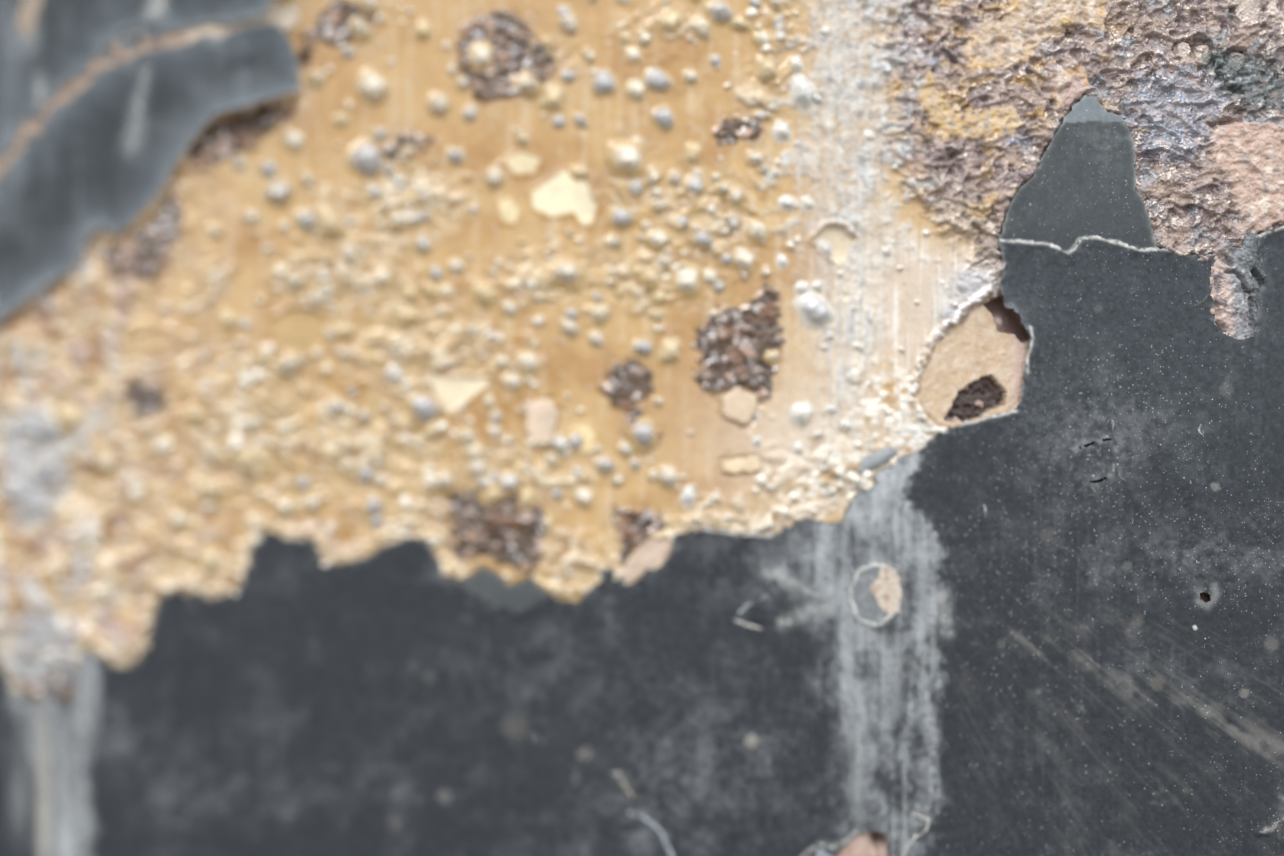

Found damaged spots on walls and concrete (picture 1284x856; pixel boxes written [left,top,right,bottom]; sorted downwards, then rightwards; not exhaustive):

peeling [876,0,1284,304]
peeling [0,0,999,694]
water stain [752,0,945,732]
spalling [915,297,1030,428]
spalling [1209,233,1269,340]
water stain [0,604,95,856]
spalling [803,830,889,856]
water stain [908,682,939,791]